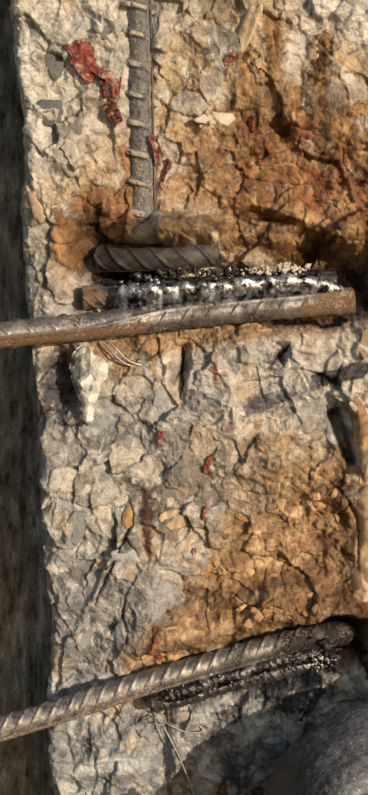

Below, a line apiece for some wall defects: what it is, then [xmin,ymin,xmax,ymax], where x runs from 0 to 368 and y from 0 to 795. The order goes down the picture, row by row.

corrosion [186,16,368,295]
corrosion [49,145,142,271]
spalling [94,243,219,272]
peeling [70,344,108,426]
crack [94,529,139,605]
corrosion [136,489,155,570]
spalling [143,453,368,646]
crack [109,590,129,650]
corrosion [124,627,205,667]
corrosion [331,602,368,666]